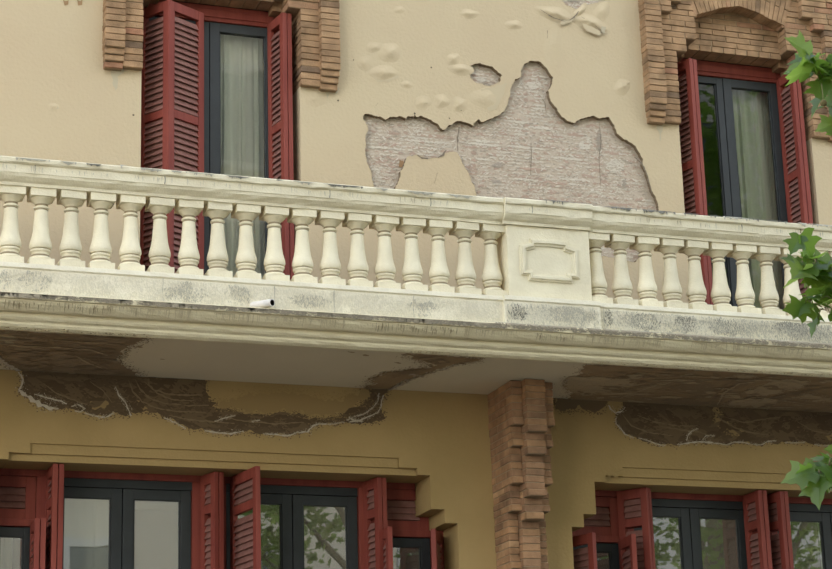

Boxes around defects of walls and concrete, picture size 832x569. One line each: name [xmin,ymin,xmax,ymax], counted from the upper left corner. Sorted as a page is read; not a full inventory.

flaking render [363,61,659,211]